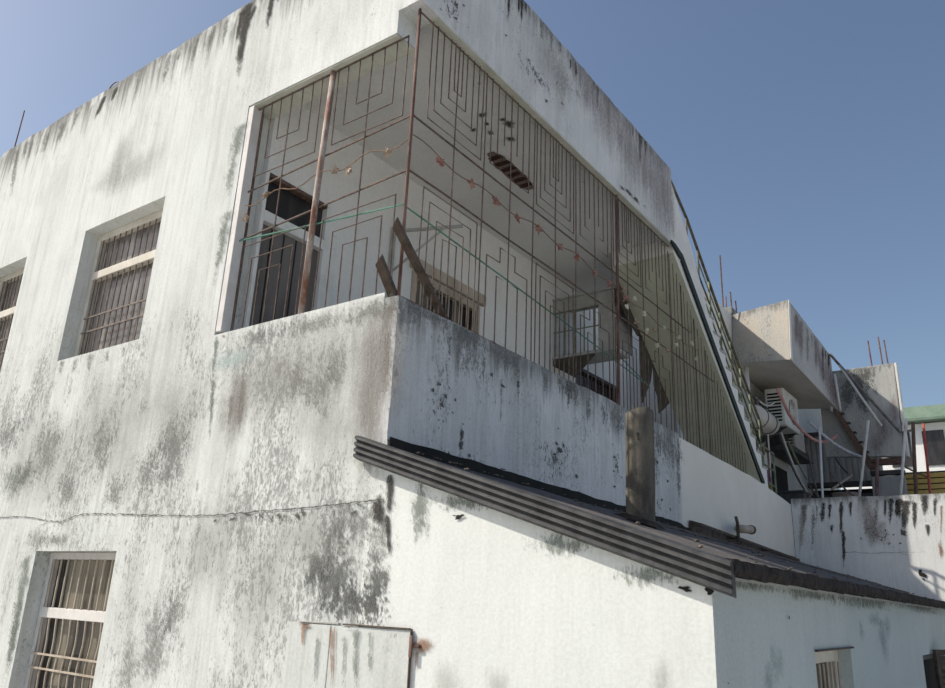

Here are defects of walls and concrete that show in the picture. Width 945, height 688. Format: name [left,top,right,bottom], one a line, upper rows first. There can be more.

leakage [163,0,273,82]
leakage [226,124,245,191]
leakage [215,213,230,265]
leakage [209,339,218,432]
leakage [233,296,533,429]
leakage [795,315,881,415]
leakage [0,412,79,502]
leakage [84,403,197,509]
crack [0,499,383,531]
leakage [800,501,852,563]
leakage [864,495,937,539]
leakage [6,527,73,666]